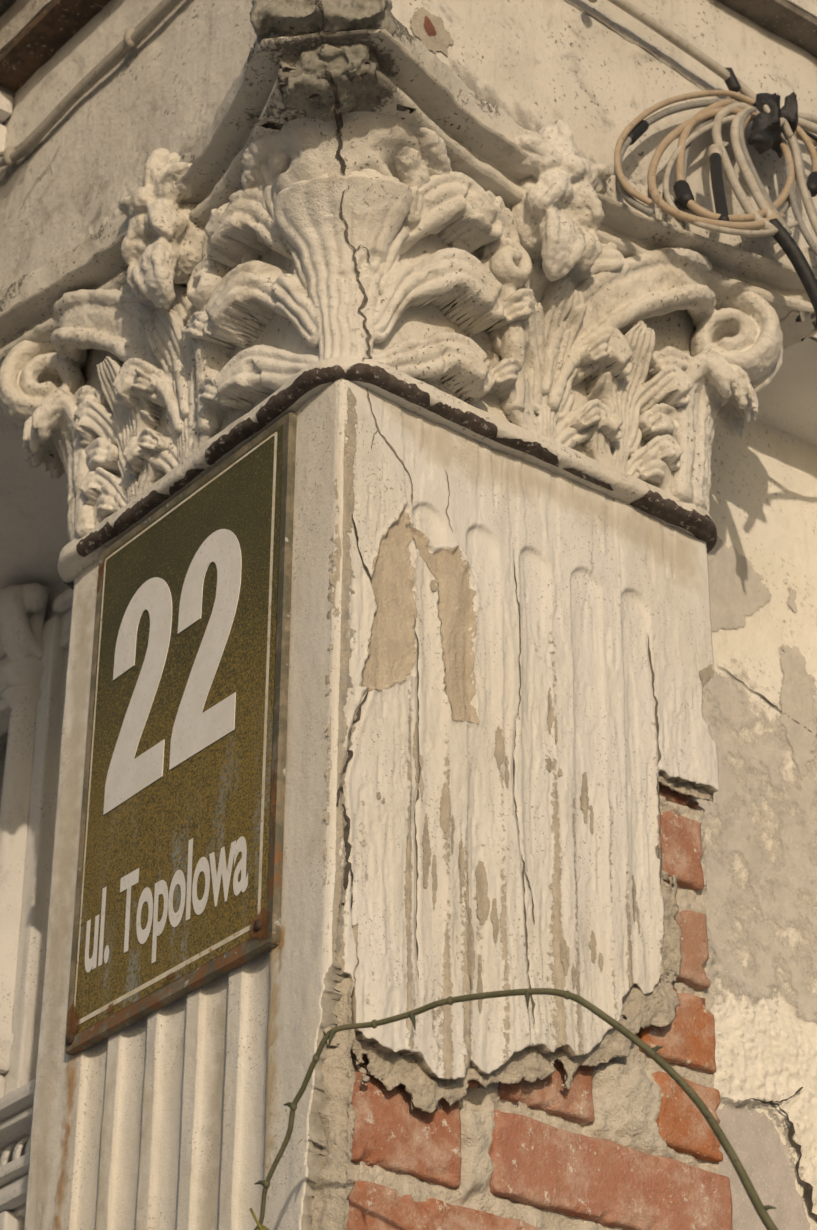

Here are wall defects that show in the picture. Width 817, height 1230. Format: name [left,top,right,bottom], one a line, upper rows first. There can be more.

crack [316,0,413,505]
spalling [76,363,613,951]
crack [349,494,372,583]
crack [445,470,453,532]
peeling [629,490,771,632]
crack [336,691,369,914]
crack [413,615,421,979]
peeling [413,716,499,1013]
spalling [323,847,682,1113]
peeling [658,644,817,1022]
corrosion [55,1170,64,1228]
crack [747,1087,817,1221]